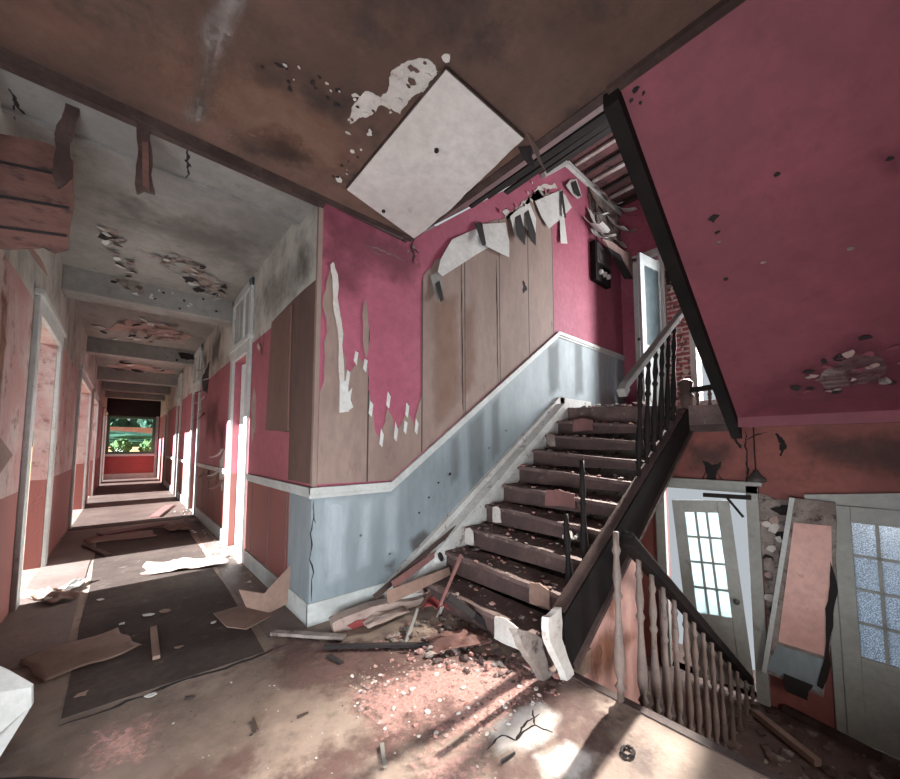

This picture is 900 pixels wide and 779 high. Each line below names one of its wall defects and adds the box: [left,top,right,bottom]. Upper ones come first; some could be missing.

peeling [345,53,450,136]
peeling [97,226,173,299]
peeling [149,254,229,300]
flaking render [584,182,638,279]
peeling [91,318,217,420]
peeling [790,345,900,394]
flaking render [759,493,789,628]